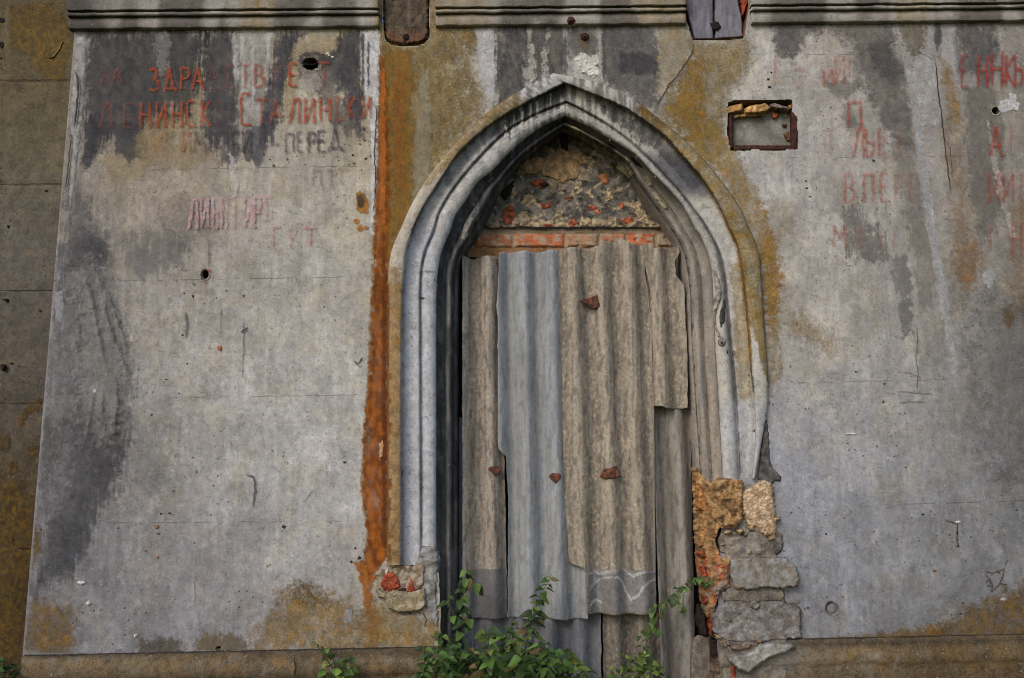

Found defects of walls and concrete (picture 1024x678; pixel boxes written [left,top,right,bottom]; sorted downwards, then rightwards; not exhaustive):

water stain [80,63,207,181]
water stain [218,29,276,193]
spalling [486,123,669,229]
crack [654,45,694,108]
water stain [596,26,794,313]
water stain [871,23,973,392]
crack [934,55,951,189]
rust [353,56,405,608]
water stain [138,580,439,652]
spalling [375,563,425,599]
spalling [690,467,781,678]